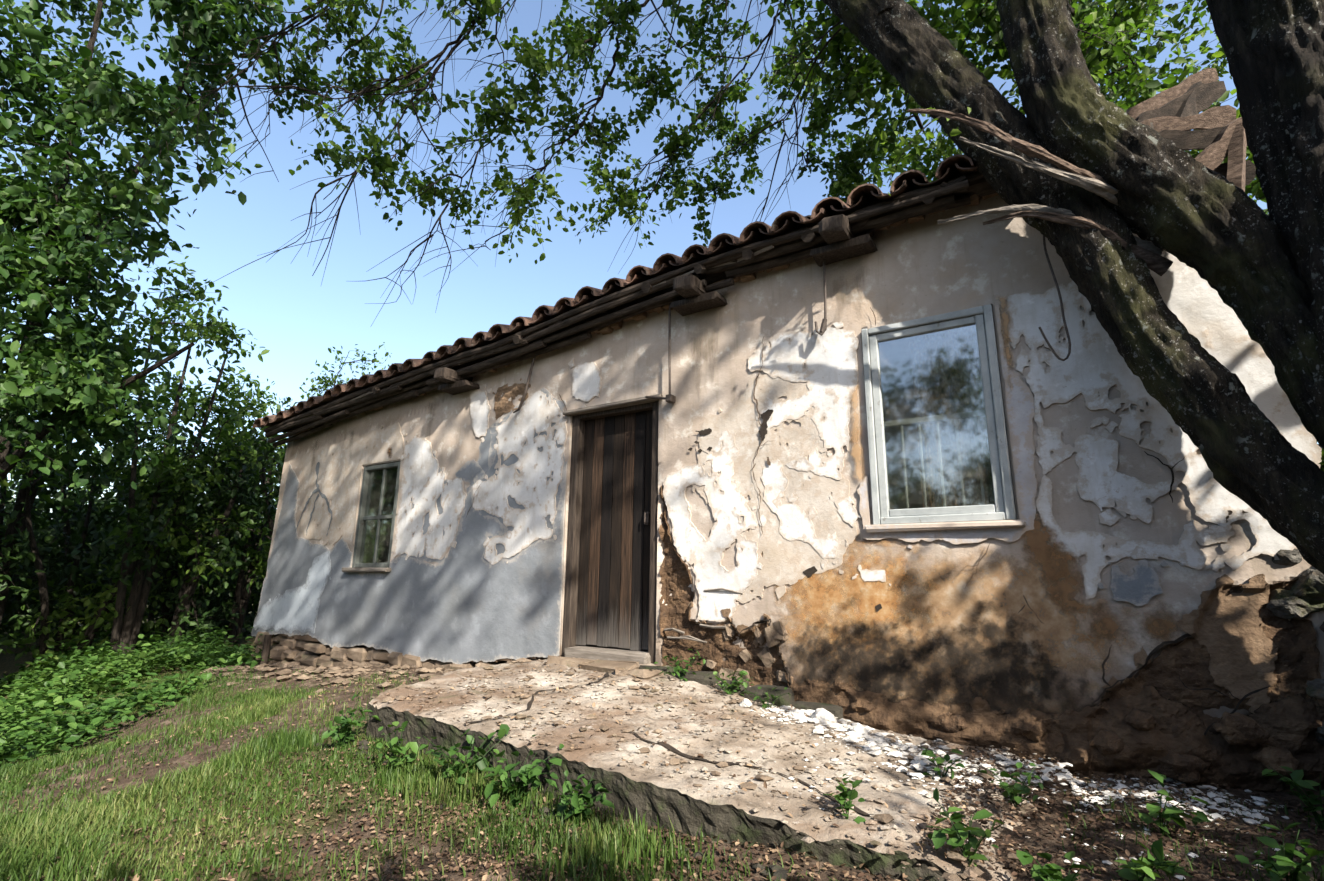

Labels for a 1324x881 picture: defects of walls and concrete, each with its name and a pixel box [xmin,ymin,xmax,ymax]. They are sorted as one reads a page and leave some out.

flaking render [251,358,602,664]
crack [749,337,775,536]
peeling [659,322,891,687]
damp [775,515,1134,712]
crack [1144,451,1185,503]
peeling [1006,250,1324,735]